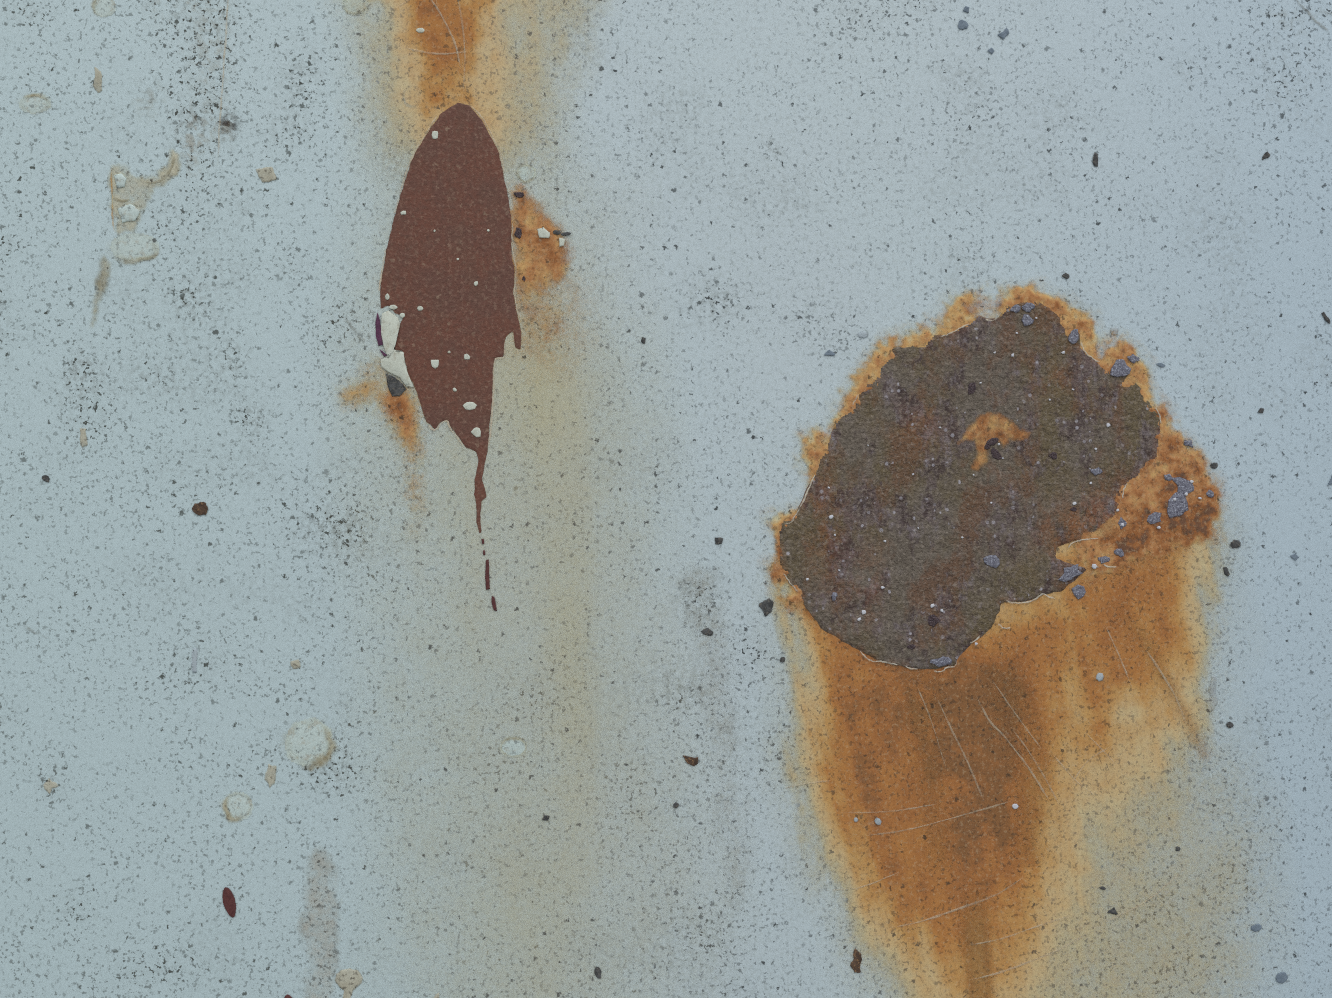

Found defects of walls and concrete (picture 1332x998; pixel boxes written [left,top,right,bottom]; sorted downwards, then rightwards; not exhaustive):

corrosion [365,0,585,161]
corrosion [342,369,419,451]
corrosion [769,284,1233,998]